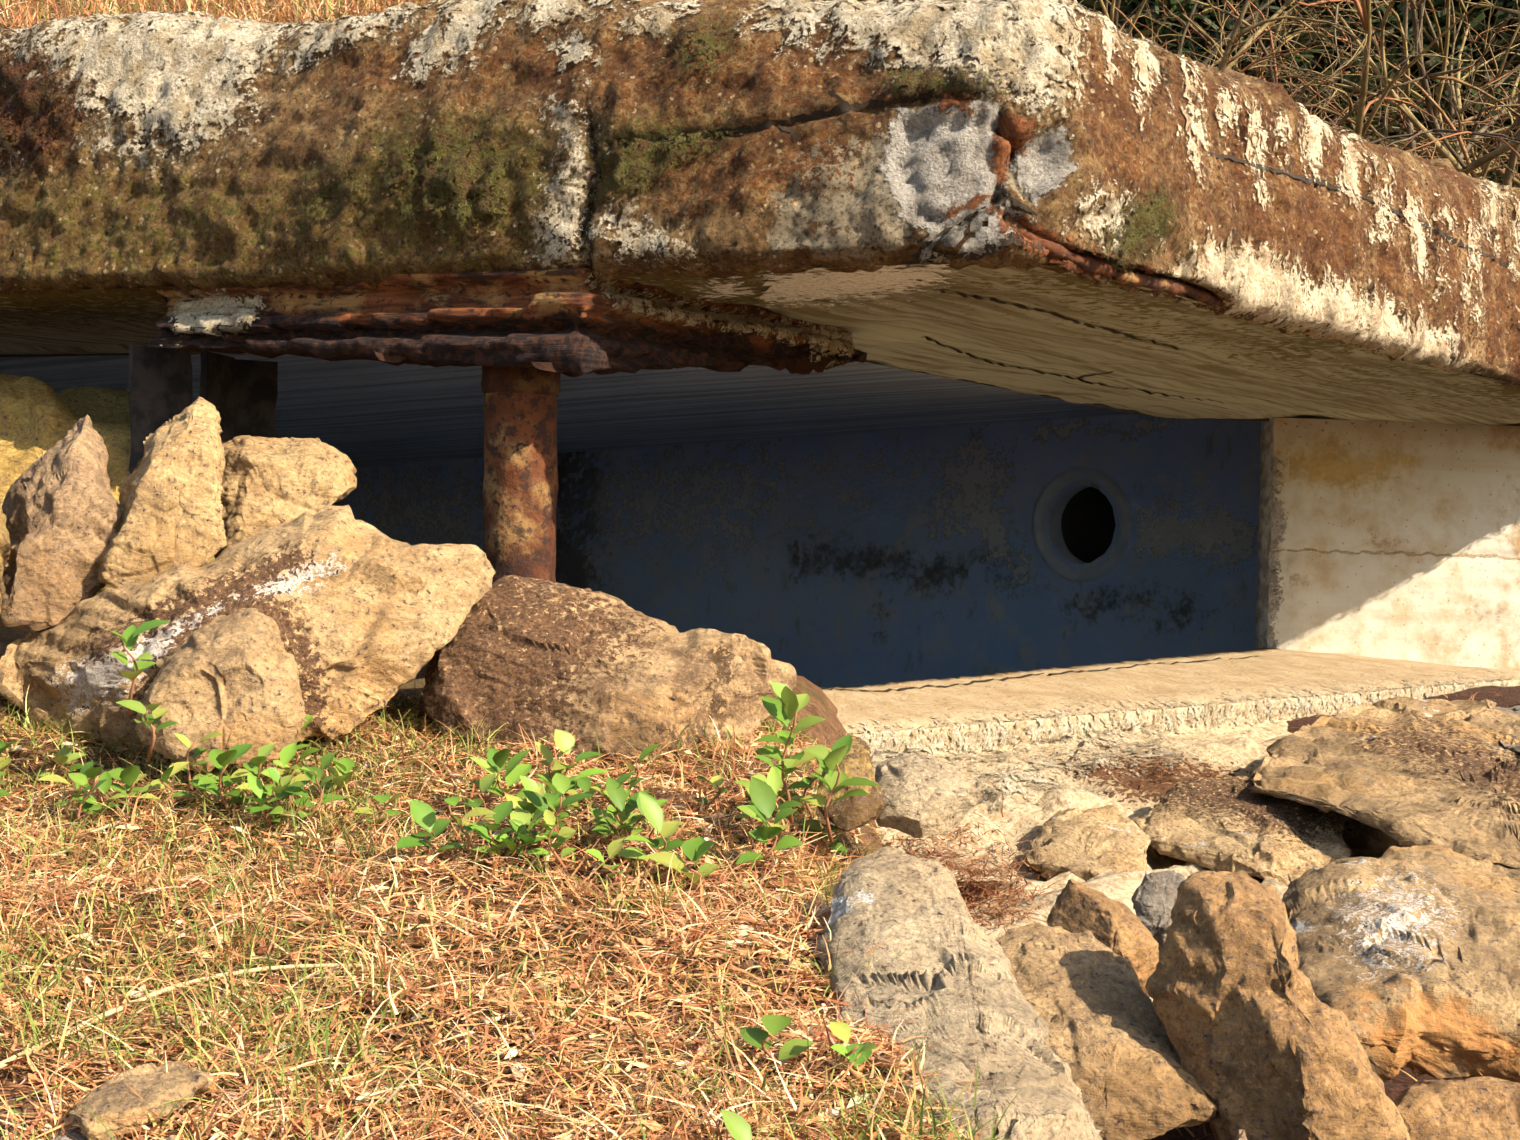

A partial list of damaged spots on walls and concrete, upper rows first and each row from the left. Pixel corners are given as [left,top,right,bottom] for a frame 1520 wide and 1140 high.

leakage [0,0,966,368]
crack [567,89,1179,350]
spalling [878,88,1231,312]
corrosion [531,362,567,373]
crack [922,337,1233,404]
leakage [789,538,1015,615]